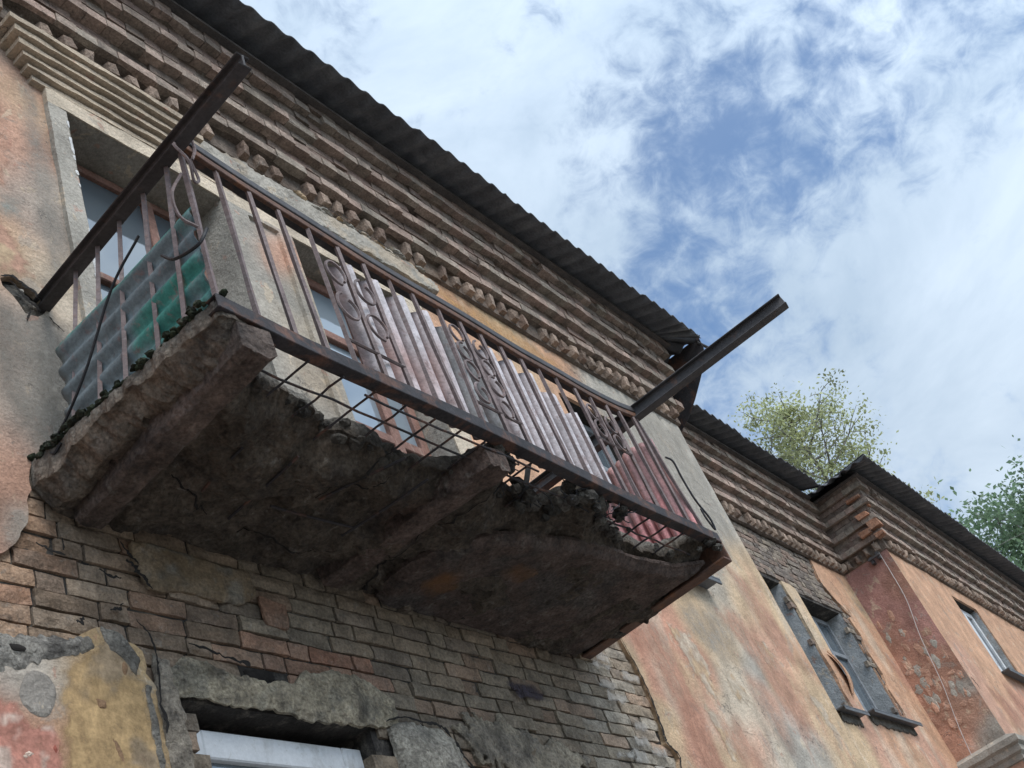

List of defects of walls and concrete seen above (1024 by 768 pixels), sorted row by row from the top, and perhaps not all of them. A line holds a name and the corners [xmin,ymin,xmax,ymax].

spalling [0,473,676,768]
peeling [669,626,752,761]
spalling [729,518,886,685]
flaking render [827,651,854,706]